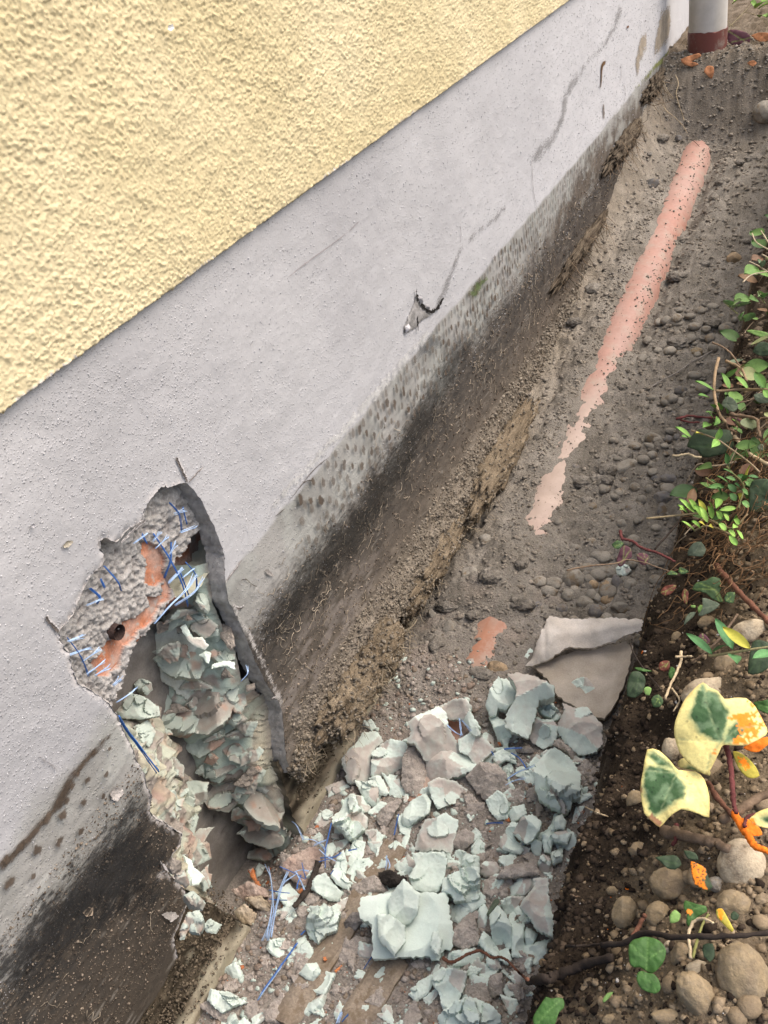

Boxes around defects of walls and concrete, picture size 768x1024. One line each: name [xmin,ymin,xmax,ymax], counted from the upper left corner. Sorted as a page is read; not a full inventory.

peeling [404,290,444,333]
damp [298,136,604,545]
flaking render [58,486,207,706]
damp [0,735,111,890]
damp [0,781,172,1006]
flaking render [110,787,124,801]